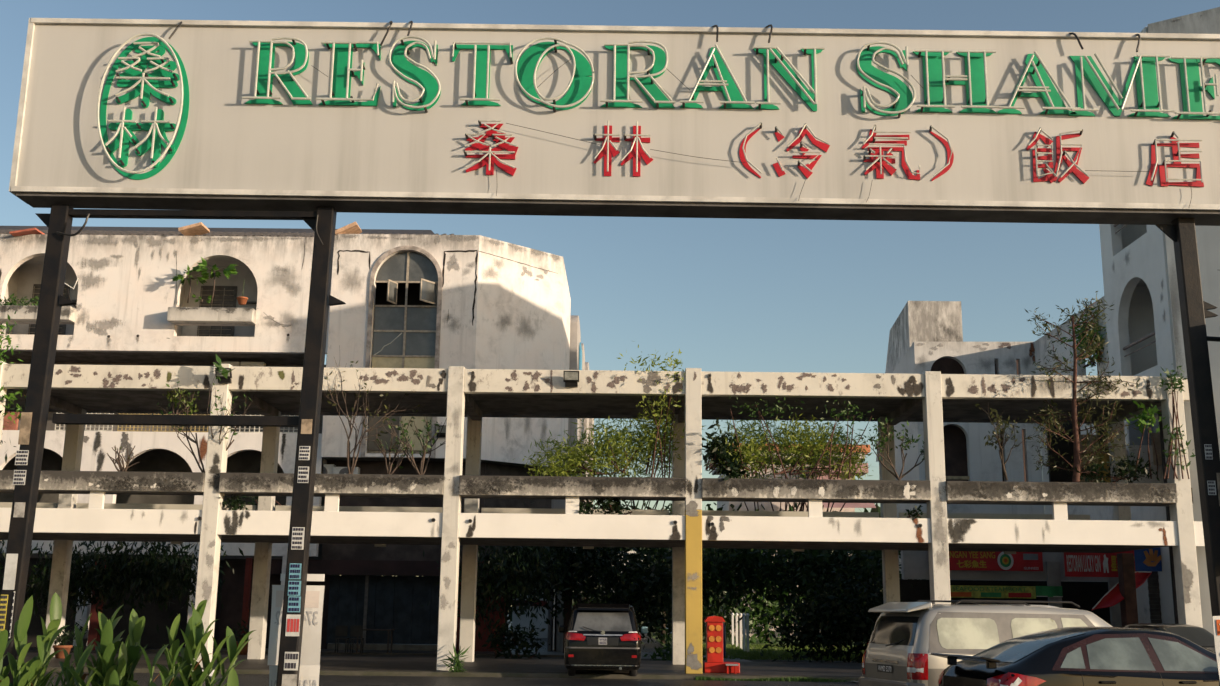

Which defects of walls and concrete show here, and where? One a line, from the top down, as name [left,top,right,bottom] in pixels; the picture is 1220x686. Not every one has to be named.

leakage [81,236,177,288]
leakage [61,305,119,347]
peeling [359,369,437,388]
peeling [505,370,553,393]
peeling [587,371,671,393]
peeling [729,372,851,394]
peeling [968,374,1025,395]
peeling [1091,384,1141,397]
leakage [315,474,917,499]
leakage [669,524,681,540]
leakage [706,516,729,540]
leakage [935,481,1176,565]